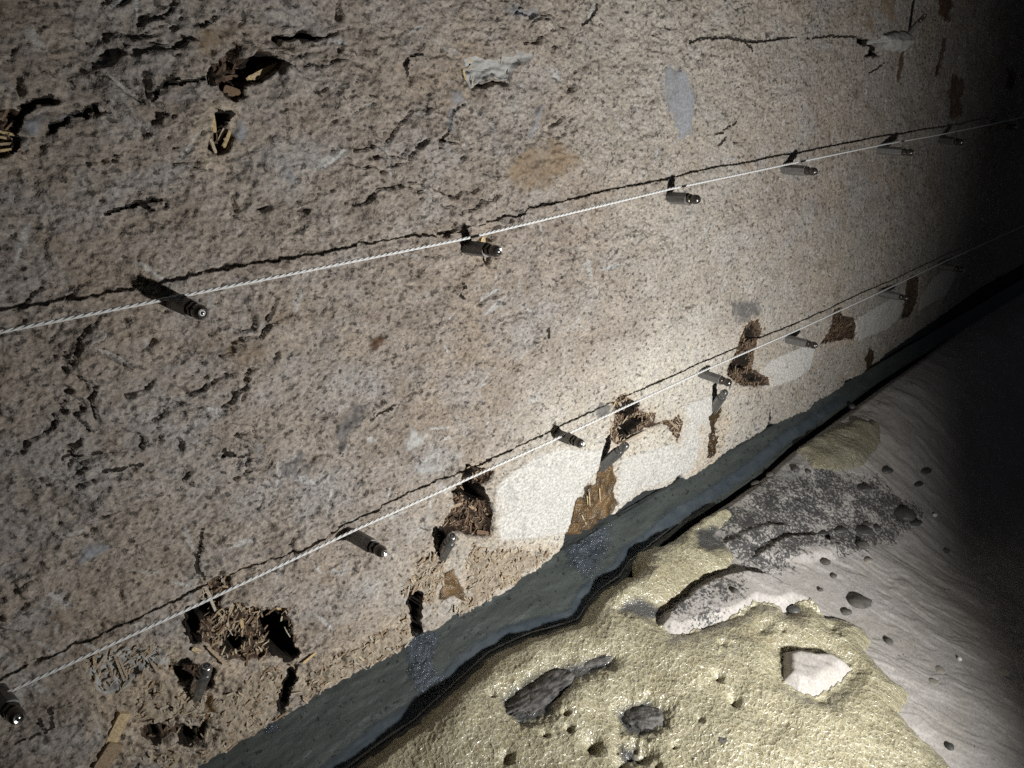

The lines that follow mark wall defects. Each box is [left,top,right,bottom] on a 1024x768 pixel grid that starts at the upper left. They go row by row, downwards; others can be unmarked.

crack [150,76,206,102]
spalling [207,29,322,154]
crack [403,53,424,77]
crack [689,34,857,52]
crack [8,94,100,155]
crack [104,196,163,216]
spalling [727,318,770,390]
spalling [609,394,683,445]
spalling [437,464,494,556]
crack [194,528,206,581]
spalling [85,575,316,694]
spalling [139,720,205,748]